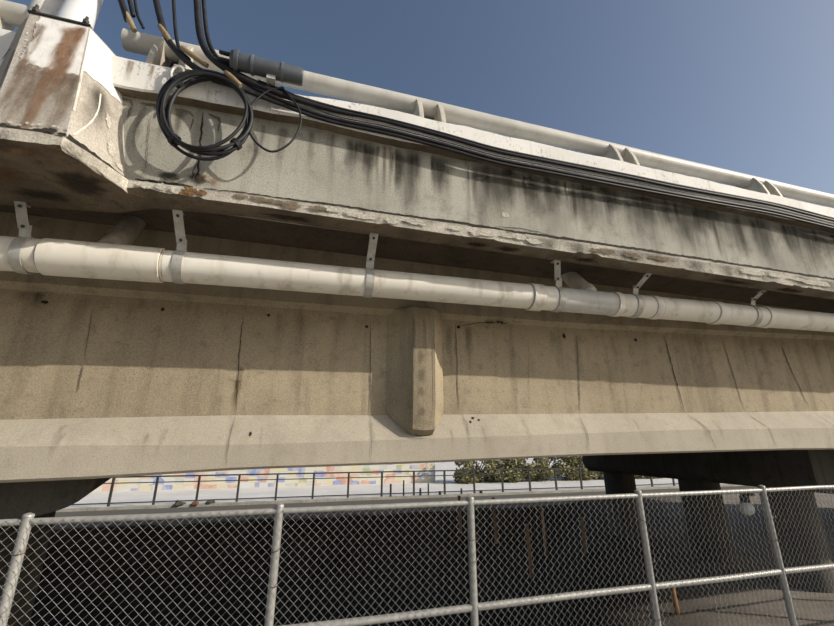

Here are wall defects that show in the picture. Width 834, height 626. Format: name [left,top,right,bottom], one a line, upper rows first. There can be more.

rust [8,28,84,119]
damp [360,144,414,174]
spalling [234,193,426,226]
spalling [448,225,543,244]
spalling [740,268,831,287]
crack [77,310,93,391]
crack [226,324,243,463]
crack [665,340,717,450]
crack [721,337,776,444]